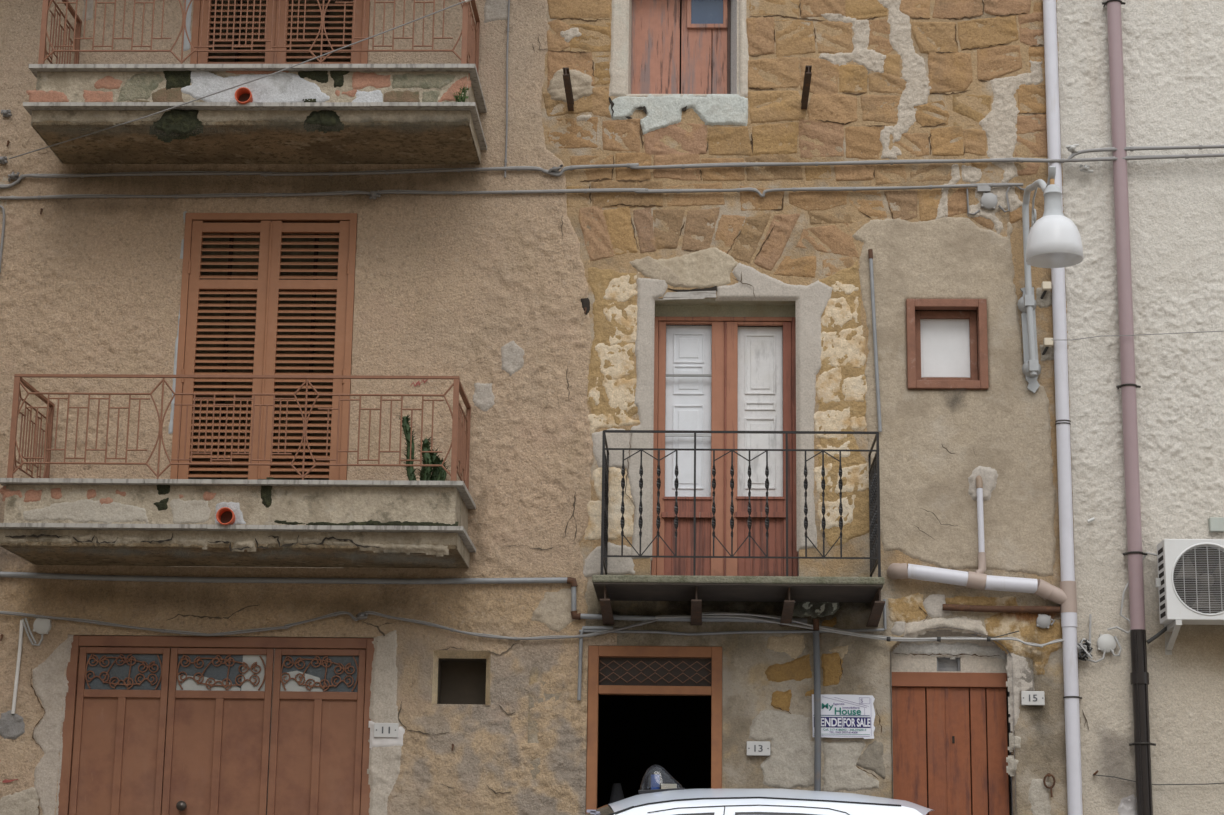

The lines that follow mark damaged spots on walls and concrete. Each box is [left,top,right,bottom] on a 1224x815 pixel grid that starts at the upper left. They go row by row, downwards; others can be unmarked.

flaking render [83,76,184,102]
flaking render [335,71,420,102]
flaking render [543,0,1048,547]
peeling [1036,288,1052,308]
peeling [1040,345,1054,361]
flaking render [888,593,928,623]
flaking render [894,596,1062,675]
flaking render [765,634,848,714]
peeling [30,635,73,815]